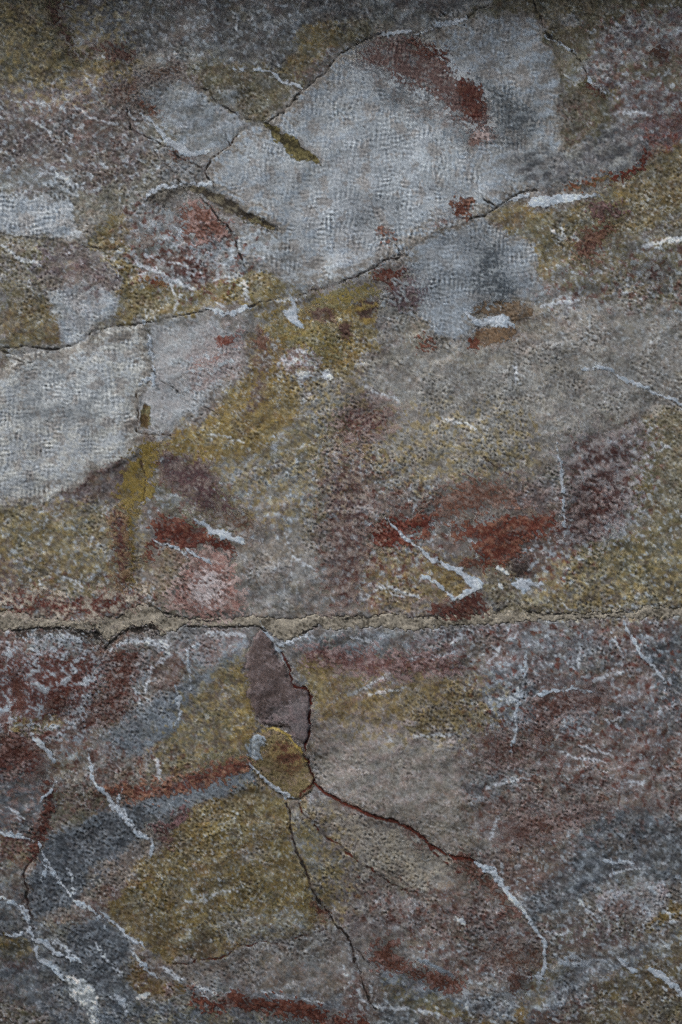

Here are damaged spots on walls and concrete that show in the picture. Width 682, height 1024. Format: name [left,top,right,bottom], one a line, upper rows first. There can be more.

crack [126,33,382,267]
crack [469,189,538,220]
crack [248,245,412,308]
crack [2,309,209,363]
crack [11,605,267,651]
crack [521,607,628,615]
crack [174,626,479,1010]